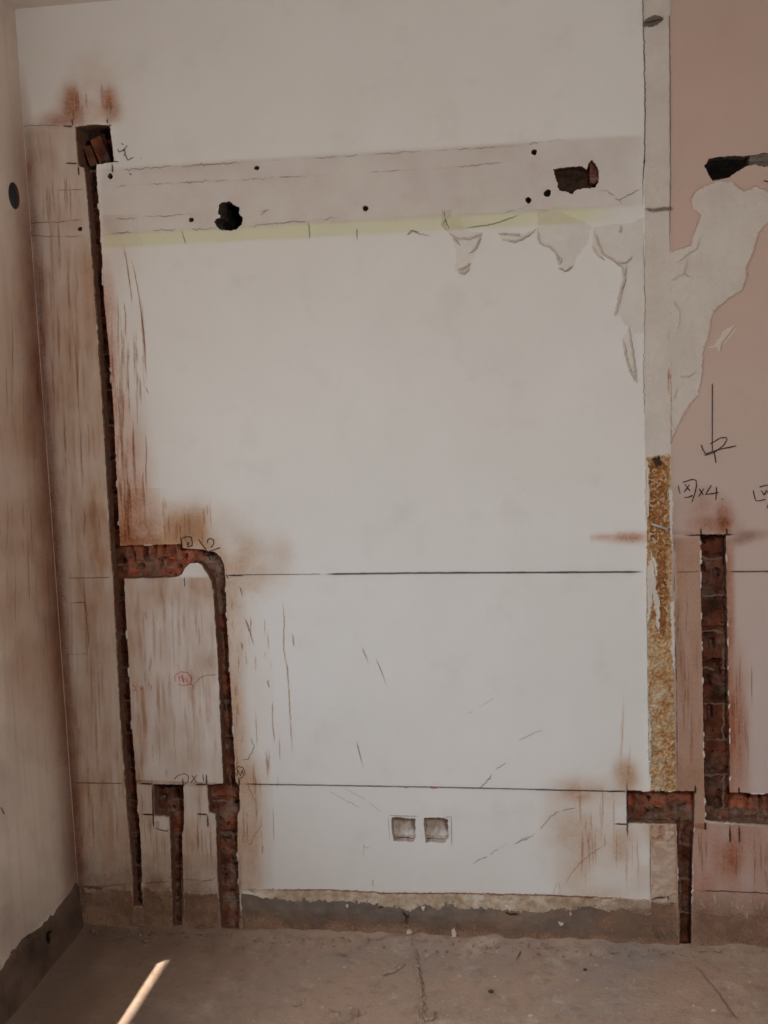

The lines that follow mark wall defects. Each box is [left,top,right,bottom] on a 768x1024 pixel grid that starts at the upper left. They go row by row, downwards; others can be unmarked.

peeling [670,153,768,443]
crack [382,948,437,1024]